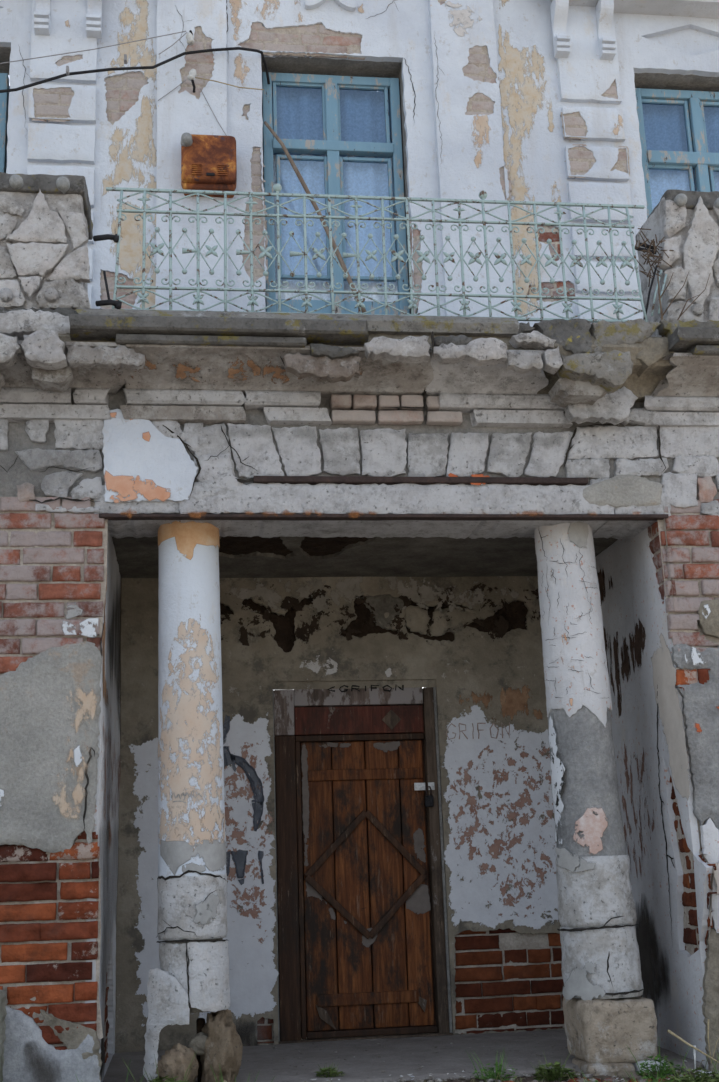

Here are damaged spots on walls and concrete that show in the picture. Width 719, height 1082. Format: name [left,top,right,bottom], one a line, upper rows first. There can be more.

peeling [100,0,157,310]
flaking render [178,27,214,99]
flaking render [229,0,365,83]
peeling [438,0,481,36]
spalling [227,24,719,426]
peeling [104,471,171,503]
crack [163,425,257,499]
flaking render [0,830,109,1081]
flaking render [0,496,121,821]
peeling [158,583,542,943]
flaking render [448,743,565,1034]